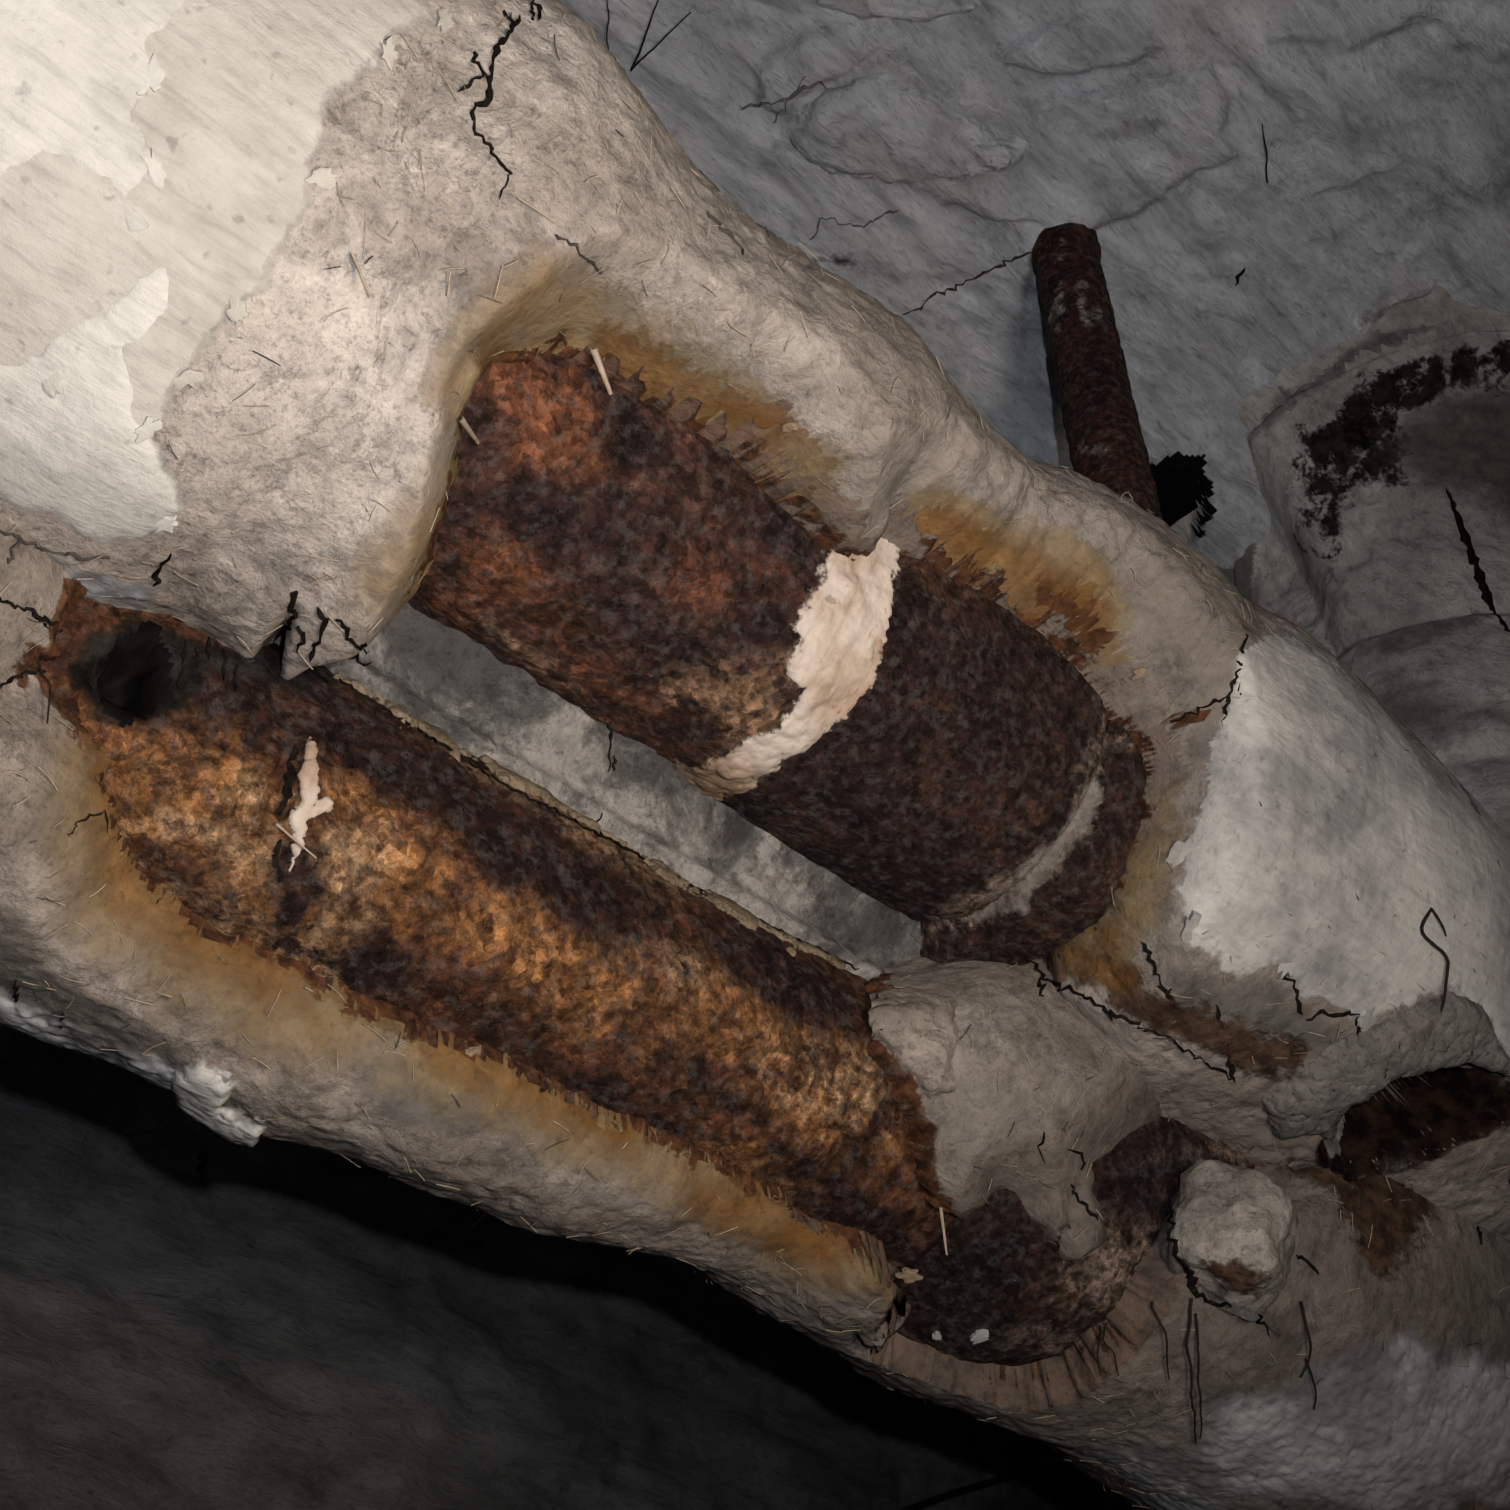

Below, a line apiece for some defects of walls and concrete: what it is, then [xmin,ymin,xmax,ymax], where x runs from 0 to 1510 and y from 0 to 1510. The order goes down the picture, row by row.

crack [457,0,543,200]
peeling [0,0,454,544]
corrosion [447,269,819,480]
spalling [482,331,871,561]
damp [1263,332,1510,576]
crack [1445,488,1510,633]
crack [273,590,645,860]
spalling [899,537,1155,908]
corrosion [64,752,373,1045]
crack [1016,942,1236,1084]
corrosion [1051,840,1309,1082]
corrosion [402,1034,875,1283]